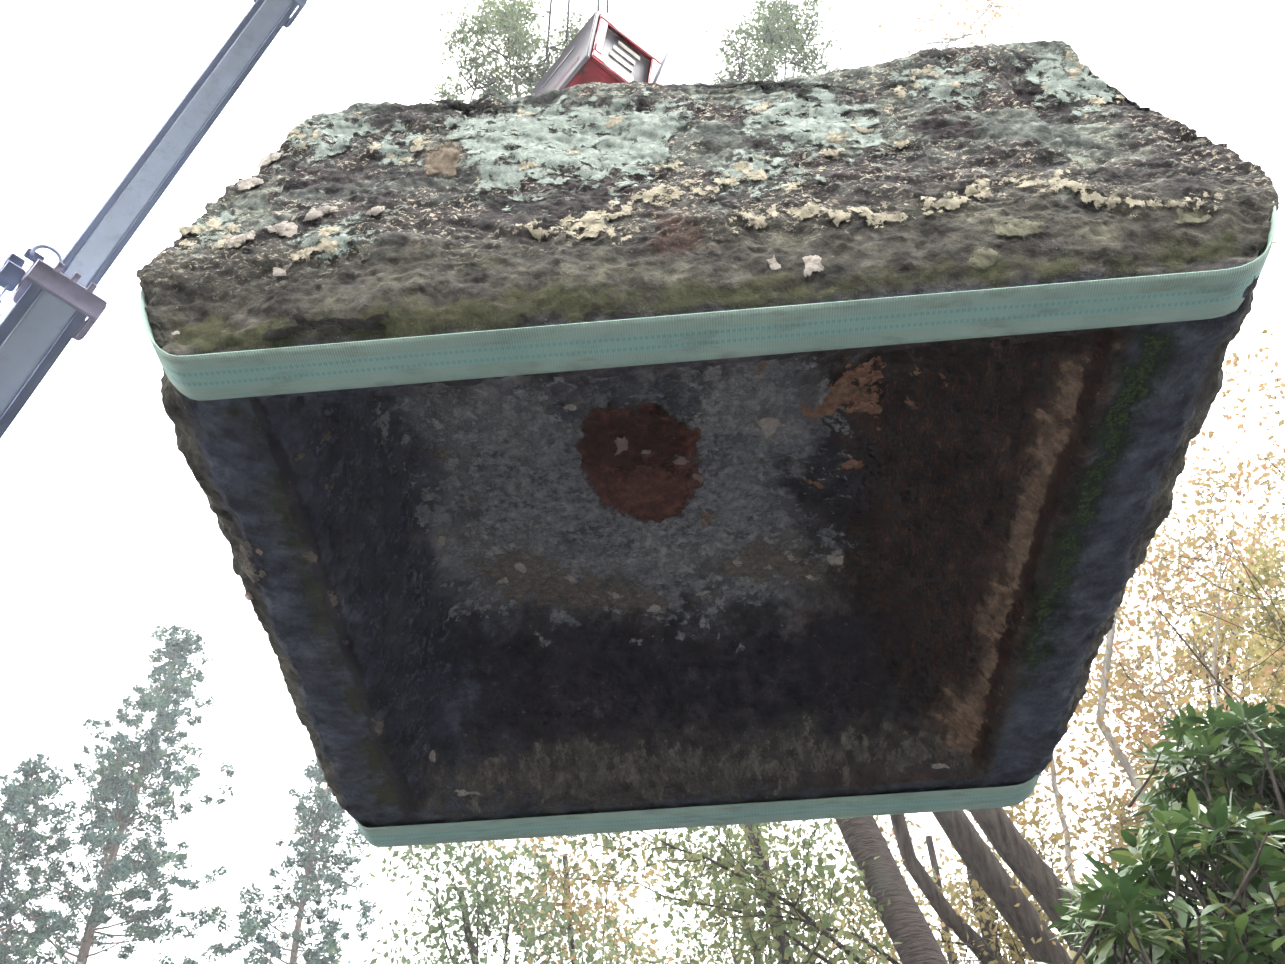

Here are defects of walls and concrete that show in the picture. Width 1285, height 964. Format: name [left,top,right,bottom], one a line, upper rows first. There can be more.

rust [574,401,706,523]
damp [303,330,1119,822]